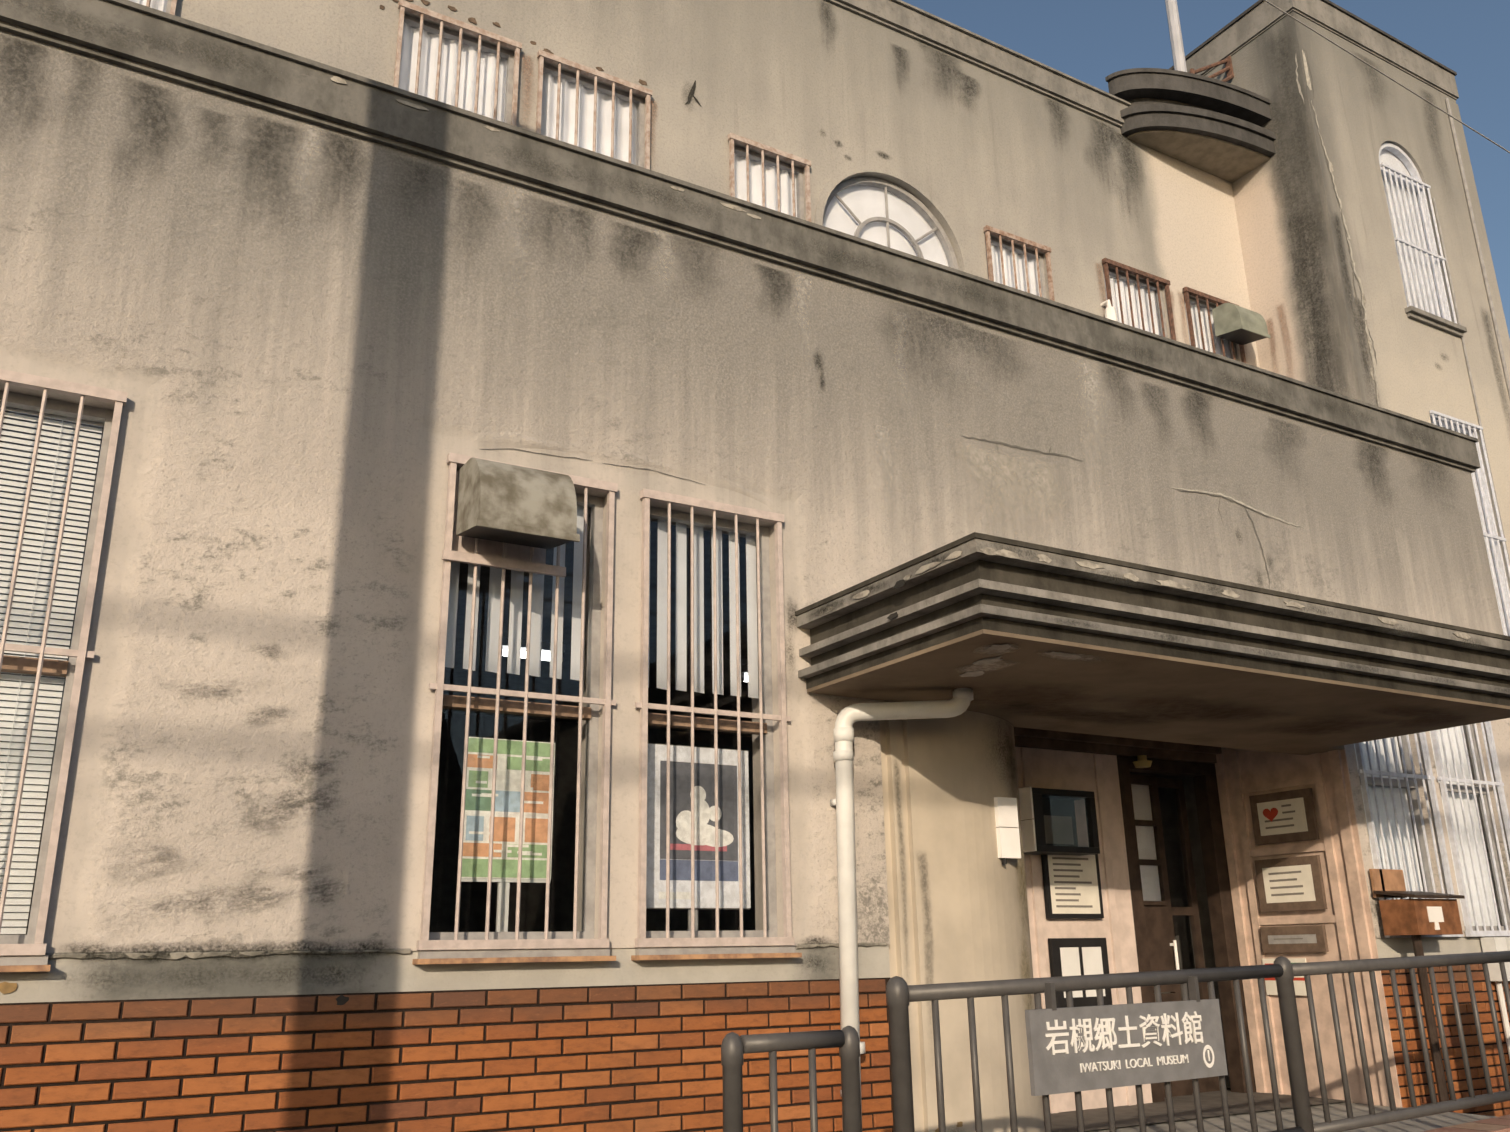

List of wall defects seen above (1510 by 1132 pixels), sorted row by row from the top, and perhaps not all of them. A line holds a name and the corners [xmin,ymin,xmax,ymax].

leakage [139,83,167,140]
leakage [251,123,355,172]
leakage [1336,219,1368,361]
crack [963,436,1081,461]
crack [1171,487,1304,585]
peeling [0,982,17,994]